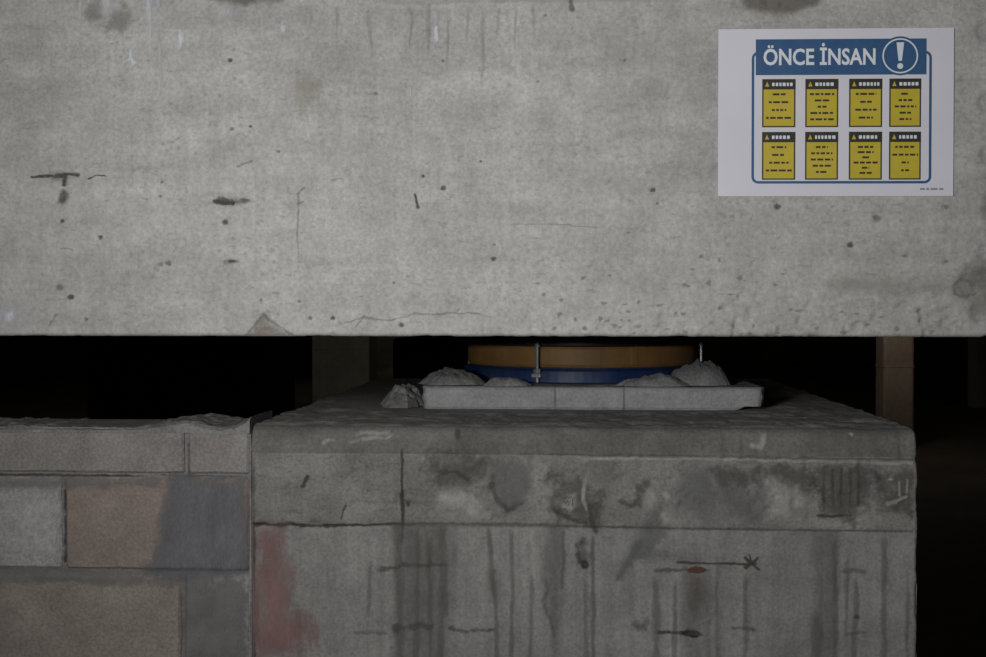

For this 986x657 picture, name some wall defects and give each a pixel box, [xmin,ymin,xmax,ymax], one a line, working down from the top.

water stain [745,0,818,12]